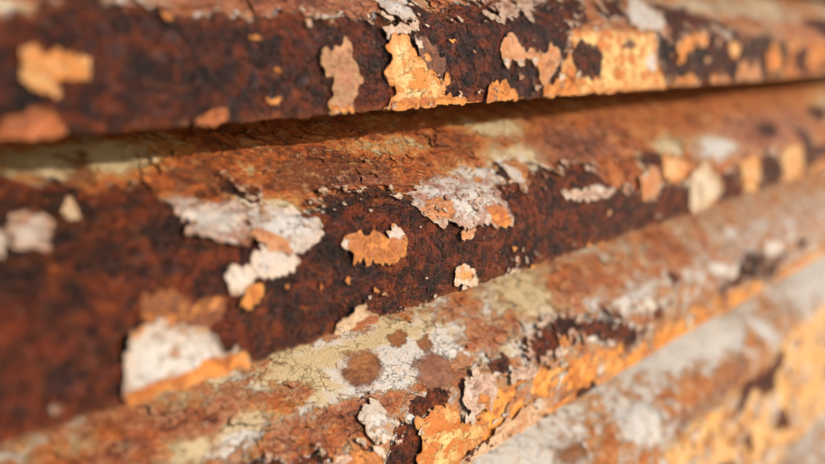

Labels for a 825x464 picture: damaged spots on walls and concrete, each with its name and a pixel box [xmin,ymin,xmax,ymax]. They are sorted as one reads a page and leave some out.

rust [0,0,629,135]
peeling [320,36,364,115]
peeling [375,0,468,111]
peeling [482,0,666,98]
rust [644,0,825,88]
peeling [341,223,408,267]
peeling [407,164,528,241]
rust [707,122,785,207]
rust [791,122,825,175]
peeling [123,193,325,407]
rust [0,149,693,464]
rust [462,235,825,464]